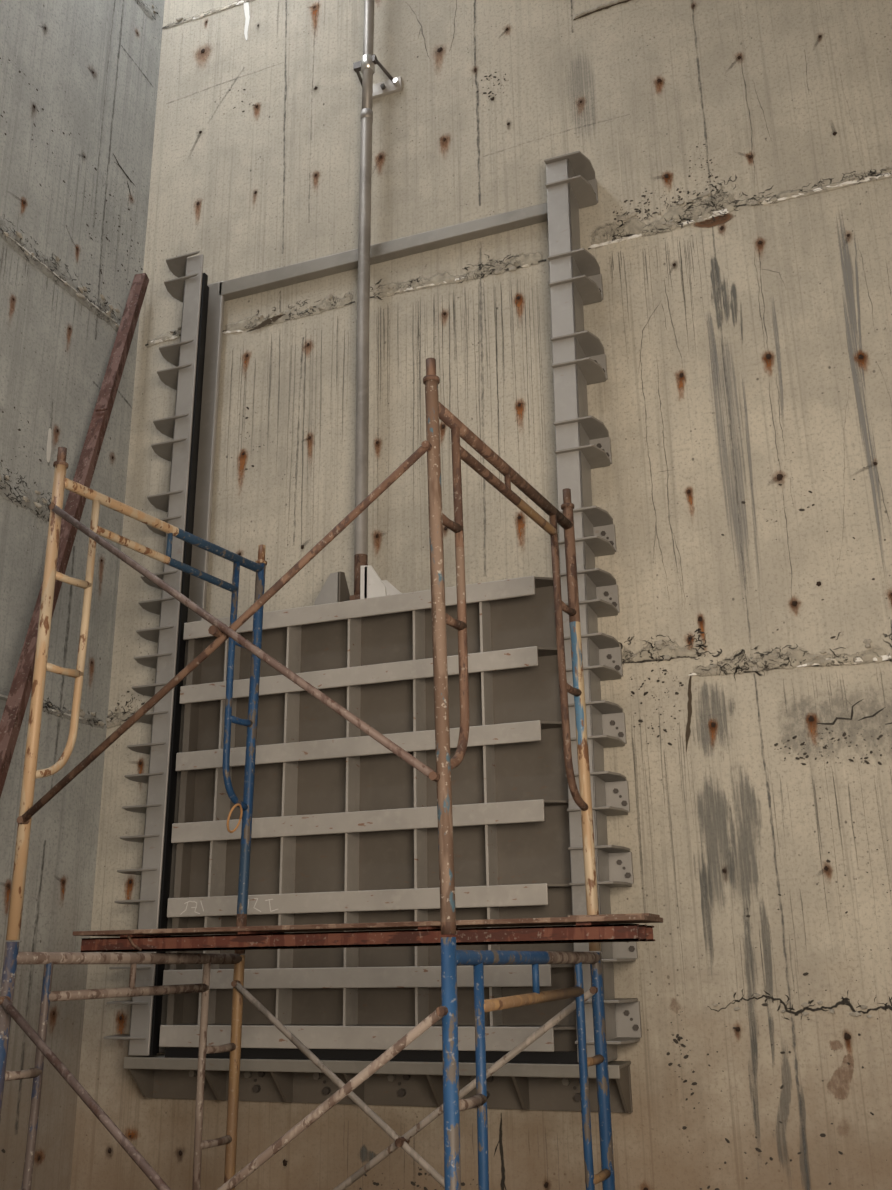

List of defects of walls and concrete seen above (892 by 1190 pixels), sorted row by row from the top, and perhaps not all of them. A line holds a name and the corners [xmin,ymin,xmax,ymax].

water stain [665,241,755,543]
water stain [839,222,881,540]
crack [816,699,892,725]
water stain [698,776,758,953]
water stain [745,907,772,1054]
crack [707,989,892,1020]